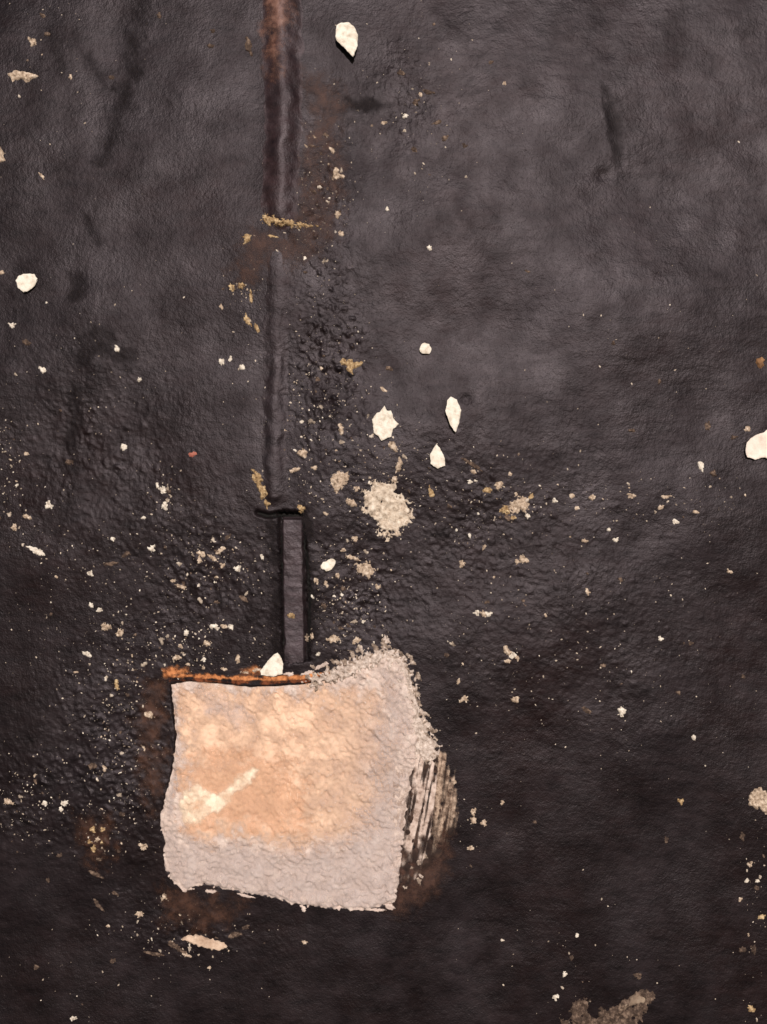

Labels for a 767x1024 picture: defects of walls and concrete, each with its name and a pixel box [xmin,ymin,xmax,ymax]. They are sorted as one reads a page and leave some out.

rust [259,0,288,58]
peeling [221,275,261,333]
peeling [620,471,710,542]
peeling [683,462,746,512]
crack [258,512,314,652]
spalling [0,327,608,912]
rust [163,662,329,685]